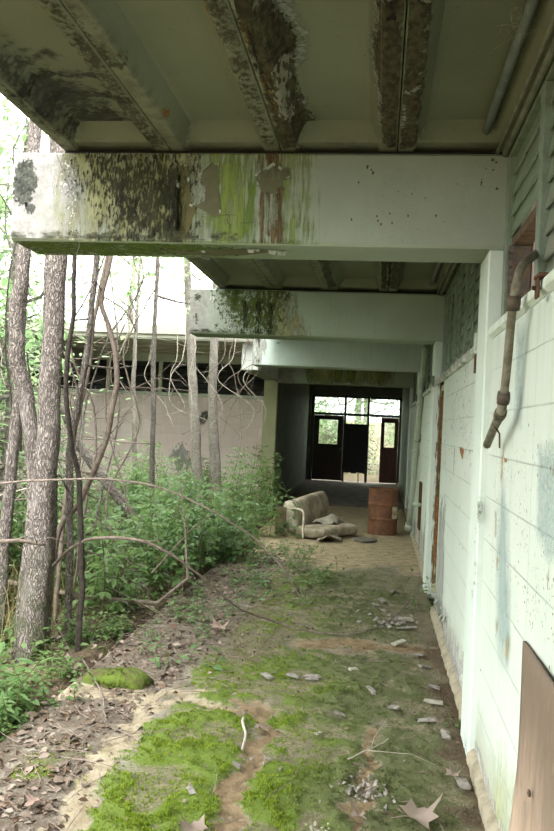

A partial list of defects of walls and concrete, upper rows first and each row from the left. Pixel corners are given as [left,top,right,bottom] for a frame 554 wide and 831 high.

leakage [0,0,202,242]
peeling [176,163,221,238]
corrosion [259,187,284,244]
corrosion [431,382,444,584]